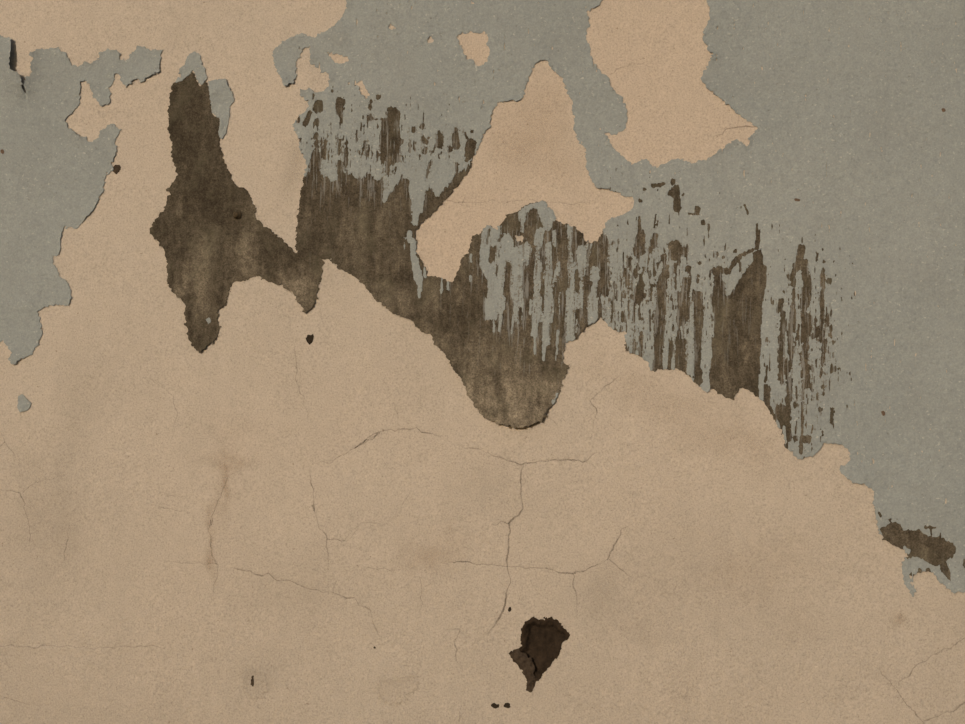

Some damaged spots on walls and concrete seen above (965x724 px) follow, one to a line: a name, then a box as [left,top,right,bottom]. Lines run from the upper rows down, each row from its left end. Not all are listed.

peeling [0,35,163,365]
peeling [150,0,965,597]
spalling [509,617,570,693]